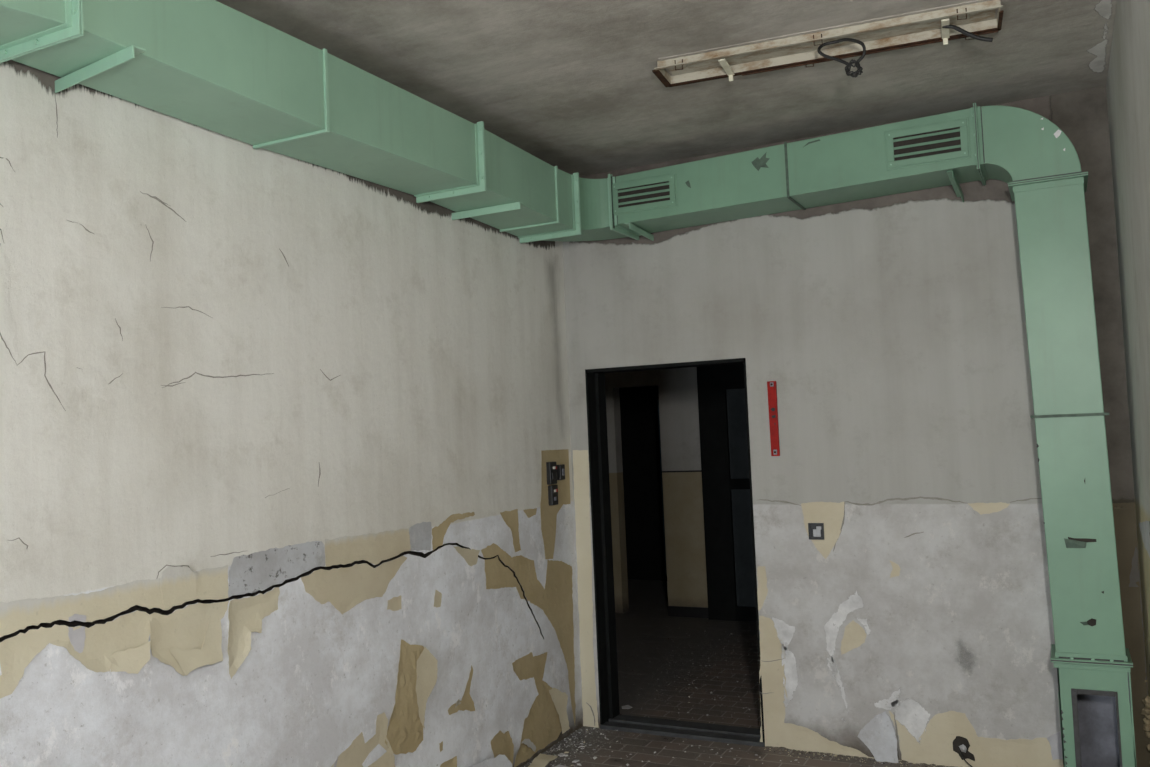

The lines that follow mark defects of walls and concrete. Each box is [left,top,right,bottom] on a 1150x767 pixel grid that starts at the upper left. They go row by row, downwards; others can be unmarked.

crack [140,191,186,262]
crack [0,333,66,411]
crack [161,372,274,388]
peeling [759,496,1042,559]
peeling [1138,520,1150,557]
crack [0,543,544,642]
peeling [0,449,599,767]
peeling [757,566,1068,767]
spalling [1141,696,1150,763]